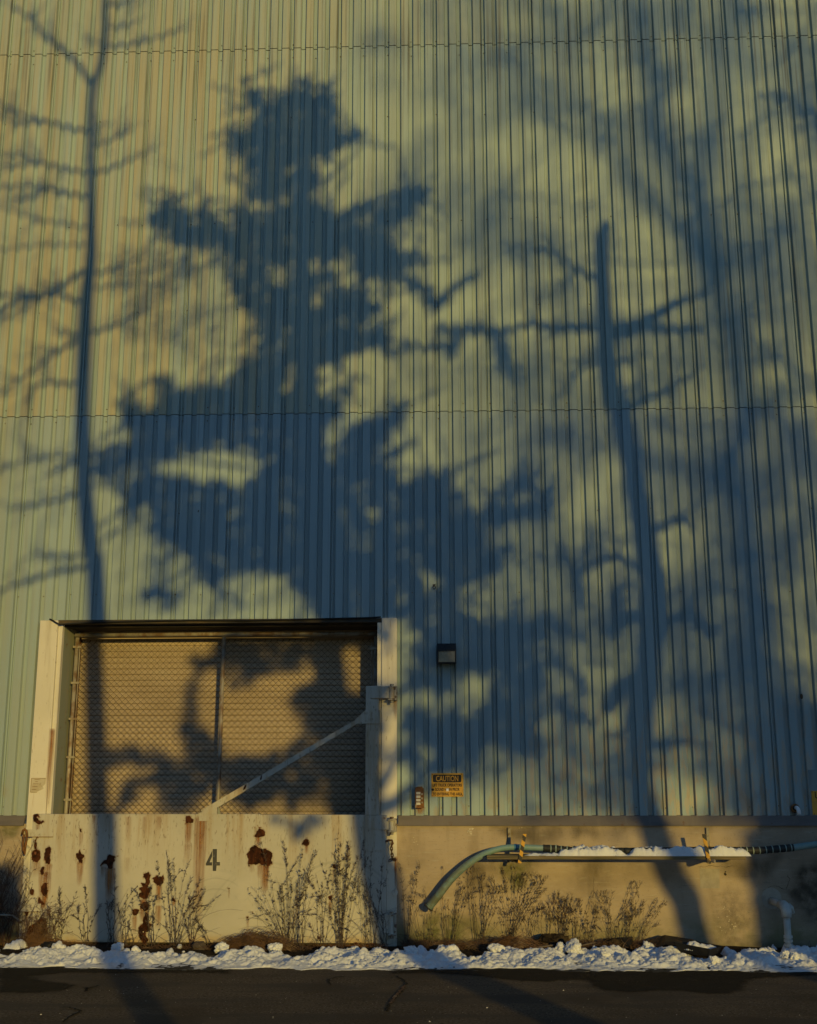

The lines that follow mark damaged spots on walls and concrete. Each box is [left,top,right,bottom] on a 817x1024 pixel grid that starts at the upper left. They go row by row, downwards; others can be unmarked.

corrosion [25,814,51,938]
corrosion [100,854,118,893]
corrosion [183,816,204,858]
corrosion [247,825,272,882]
corrosion [132,872,164,945]